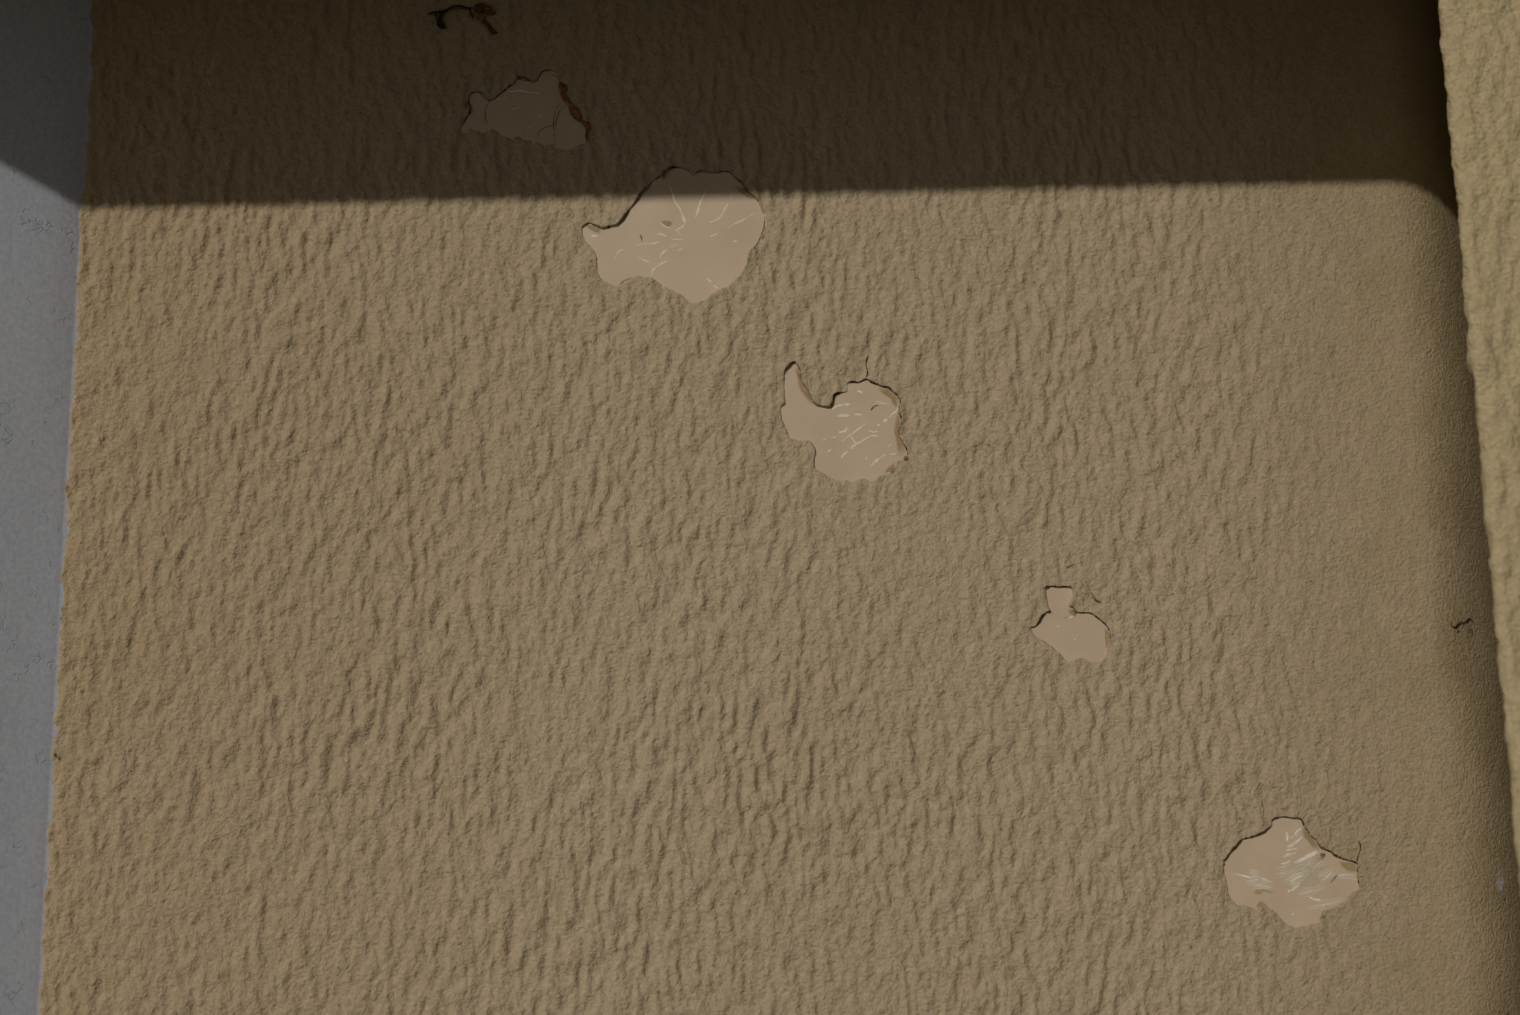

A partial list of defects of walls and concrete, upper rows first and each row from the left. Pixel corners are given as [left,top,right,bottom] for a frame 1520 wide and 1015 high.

peeling [461,70,590,150]
peeling [583,166,767,303]
peeling [780,356,908,482]
peeling [1031,586,1111,662]
peeling [1223,816,1361,928]